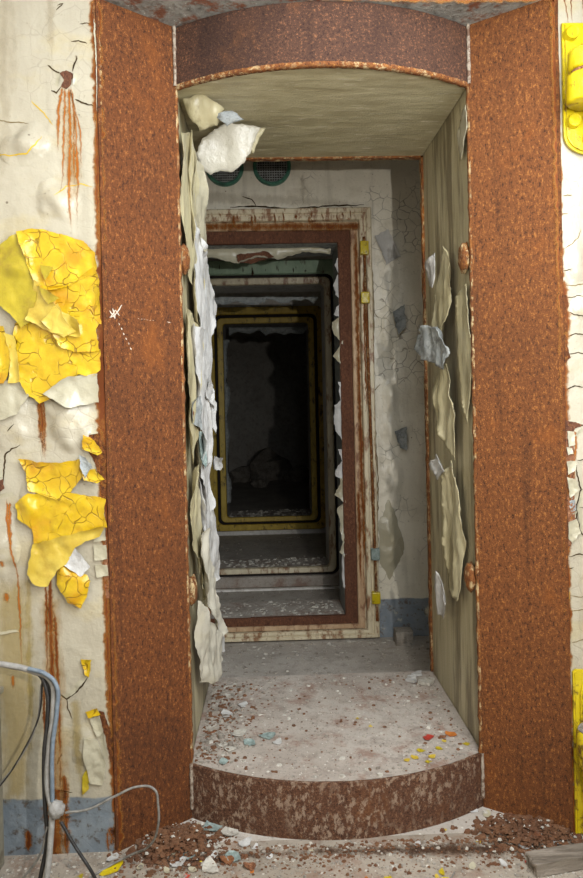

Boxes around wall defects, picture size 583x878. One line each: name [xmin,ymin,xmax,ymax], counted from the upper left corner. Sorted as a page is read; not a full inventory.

corrosion [56,89,82,219]
corrosion [549,0,583,432]
peeling [0,228,101,420]
peeling [15,429,110,609]
corrosion [89,0,125,851]
peeling [180,95,343,685]
peeling [333,382,346,588]
peeling [393,304,406,335]
peeling [395,427,408,451]
peeling [414,246,472,619]
corrosion [564,546,573,637]
crack [569,459,583,569]